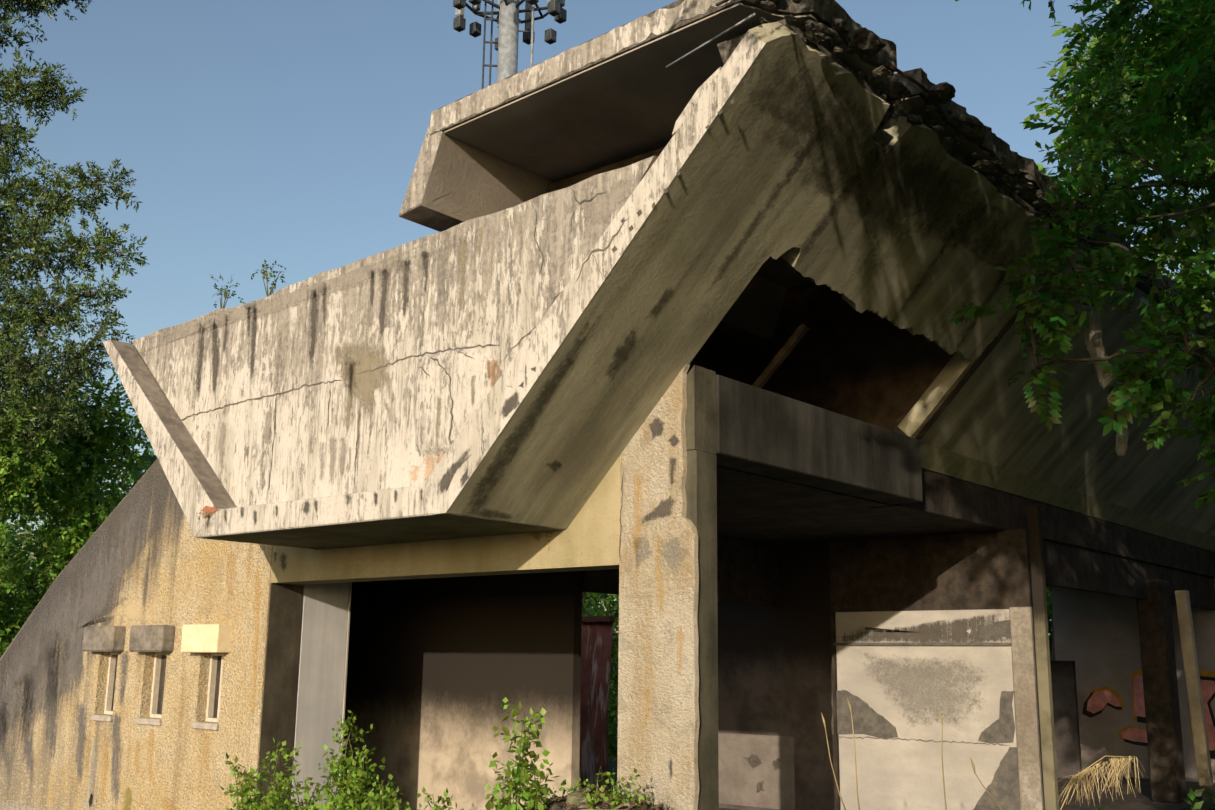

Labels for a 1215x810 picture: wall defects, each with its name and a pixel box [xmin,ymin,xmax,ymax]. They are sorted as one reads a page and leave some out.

water stain [149,248,429,481]
crack [181,186,632,496]
water stain [459,215,522,306]
water stain [642,419,678,523]
water stain [713,72,1011,350]
spalling [666,0,1123,258]
water stain [0,488,154,799]